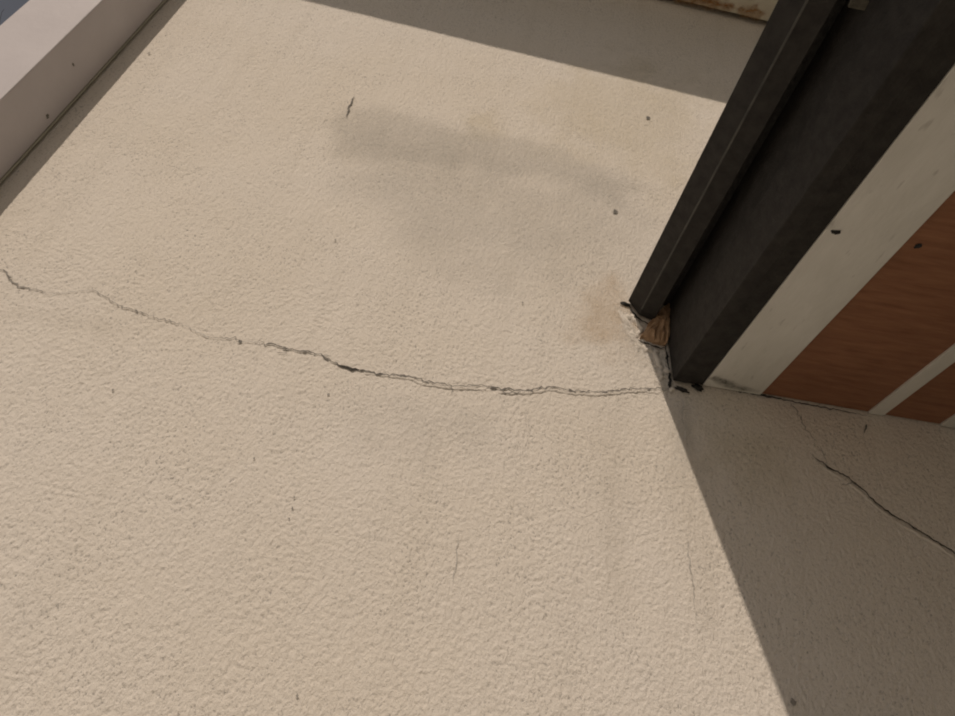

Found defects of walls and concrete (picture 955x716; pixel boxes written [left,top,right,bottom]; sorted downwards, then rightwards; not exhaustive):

crack [0,269,669,396]
spalling [615,306,675,393]
crack [738,391,955,559]